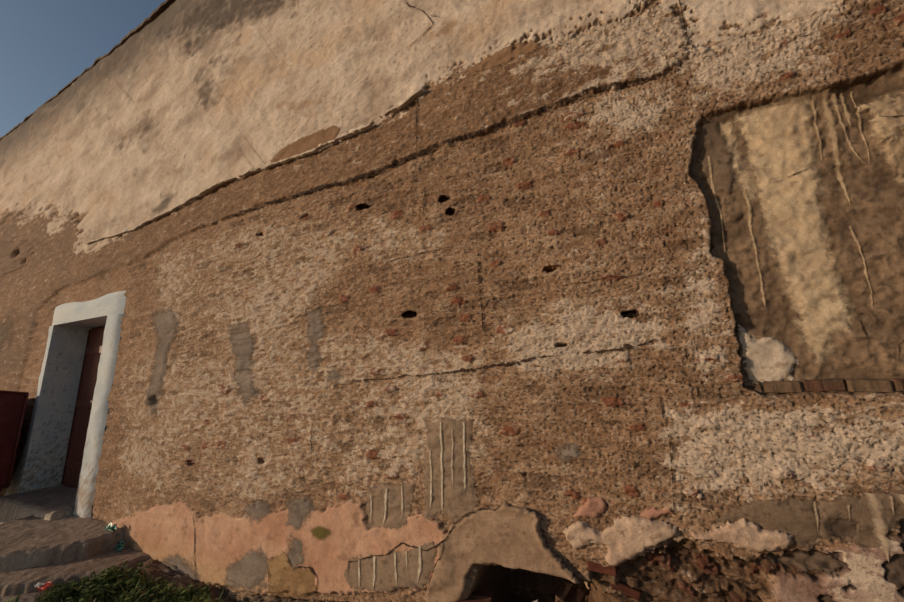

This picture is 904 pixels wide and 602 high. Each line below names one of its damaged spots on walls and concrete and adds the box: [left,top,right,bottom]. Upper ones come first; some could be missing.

crack [405,0,439,47]
flaking render [85,89,423,245]
crack [223,74,659,218]
leakage [831,91,870,165]
leakage [707,156,725,253]
leakage [743,189,766,308]
crack [355,355,554,382]
crack [583,339,654,353]
spalling [266,550,317,597]
spalling [830,518,861,544]
leakage [865,493,904,562]
spalling [884,518,904,597]